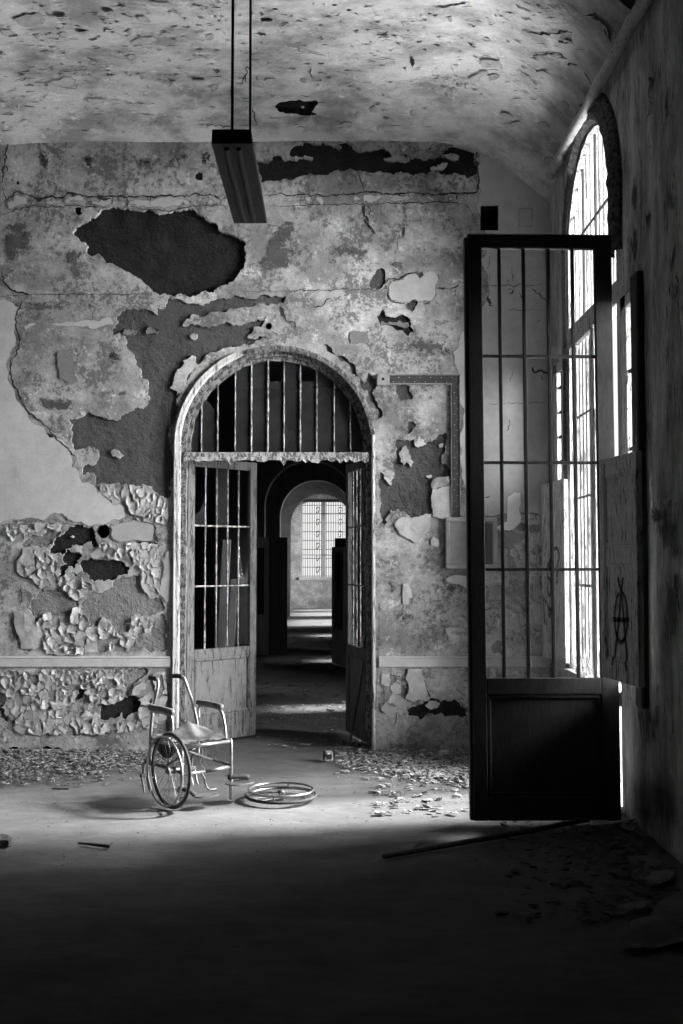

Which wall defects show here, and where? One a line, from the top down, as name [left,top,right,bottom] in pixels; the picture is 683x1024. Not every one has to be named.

crack [1,12,281,215]
flaking render [0,2,581,183]
crack [268,10,343,128]
crack [347,2,612,104]
flaking render [41,208,300,524]
flaking render [369,262,402,289]
flaking render [396,385,413,401]
flaking render [377,300,450,355]
flaking render [378,421,451,547]
flaking render [4,522,169,657]
flaking render [0,668,167,749]
flaking render [381,669,467,719]